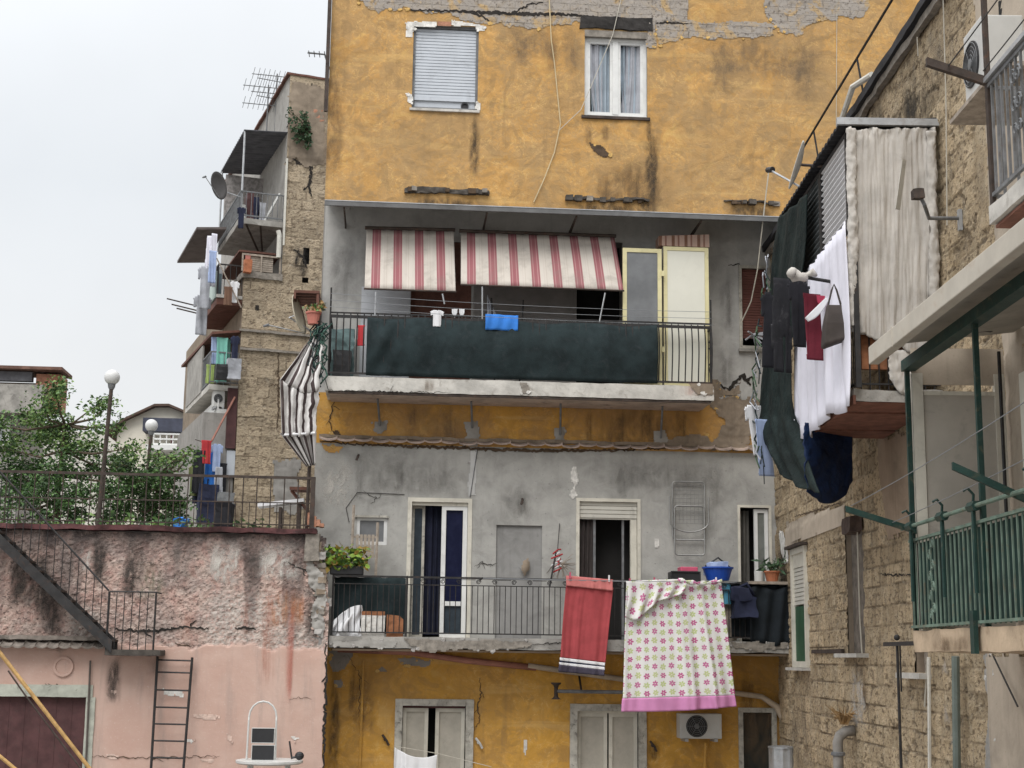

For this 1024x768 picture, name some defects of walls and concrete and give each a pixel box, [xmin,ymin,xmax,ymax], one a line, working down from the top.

peeling [357,0,870,49]
peeling [589,142,613,158]
crack [285,158,313,196]
peeling [654,379,760,452]
peeling [569,467,579,499]
water stain [264,553,293,577]
crack [115,620,209,647]